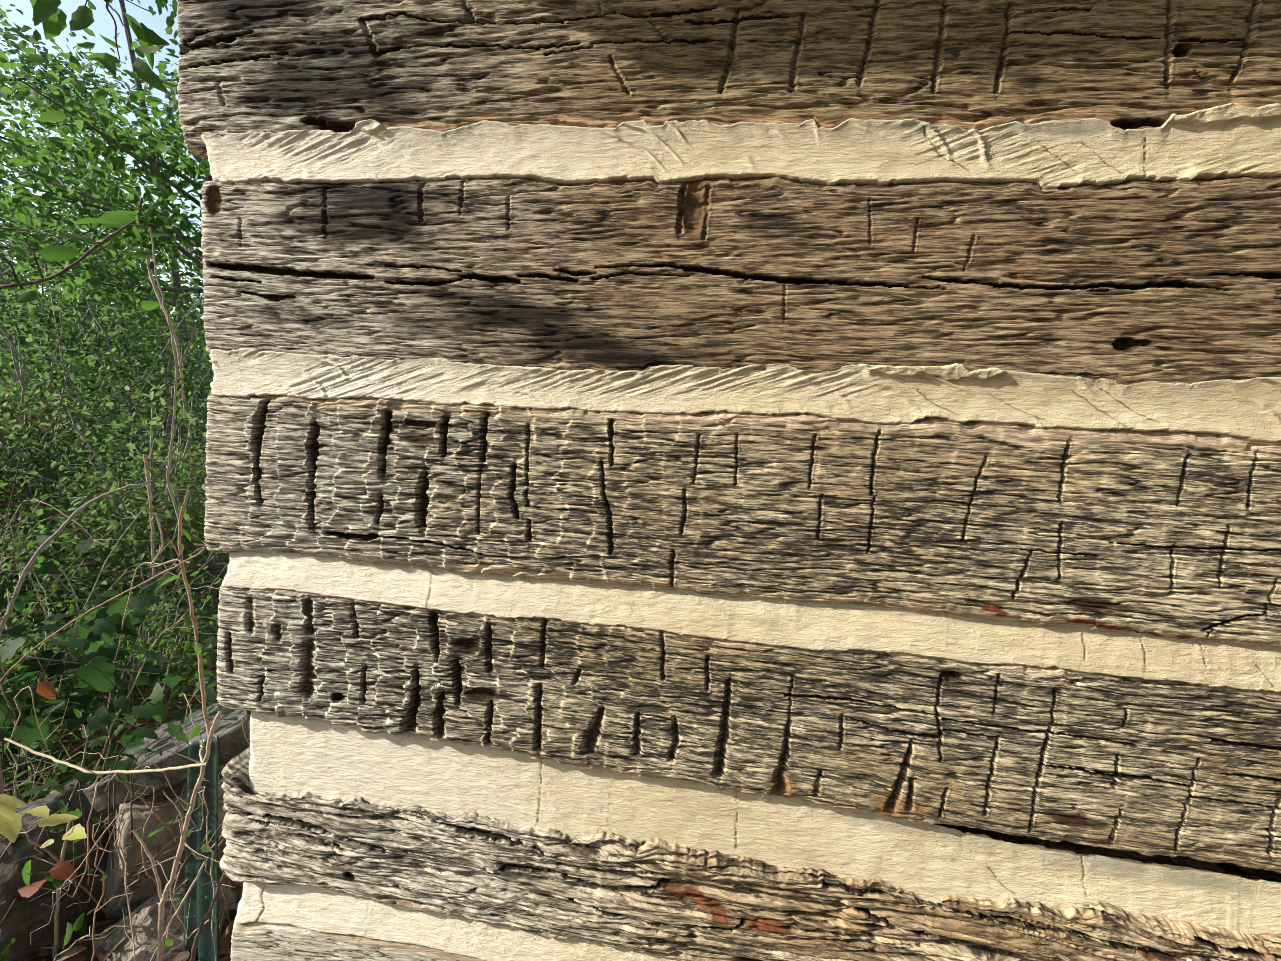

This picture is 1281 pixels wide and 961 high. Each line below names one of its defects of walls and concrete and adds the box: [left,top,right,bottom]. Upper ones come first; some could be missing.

water stain [209,0,314,30]
water stain [420,26,447,37]
water stain [240,40,426,117]
water stain [280,182,451,242]
crack [208,263,1281,302]
water stain [437,291,664,368]